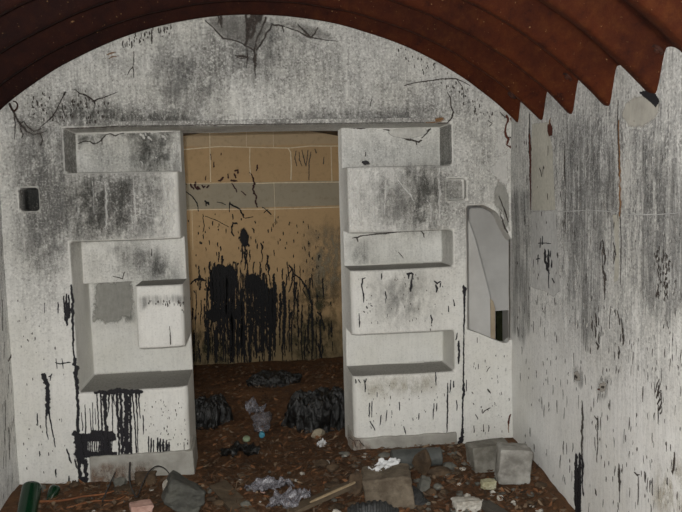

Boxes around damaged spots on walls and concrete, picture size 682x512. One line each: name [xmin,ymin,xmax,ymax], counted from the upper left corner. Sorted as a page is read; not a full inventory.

crack [42,89,118,129]
crack [191,121,266,129]
crack [404,78,470,145]
crack [249,172,258,208]
crack [353,232,396,241]
leakage [536,236,555,288]
leakage [190,231,341,364]
leakage [55,284,170,483]
leakage [455,293,467,428]